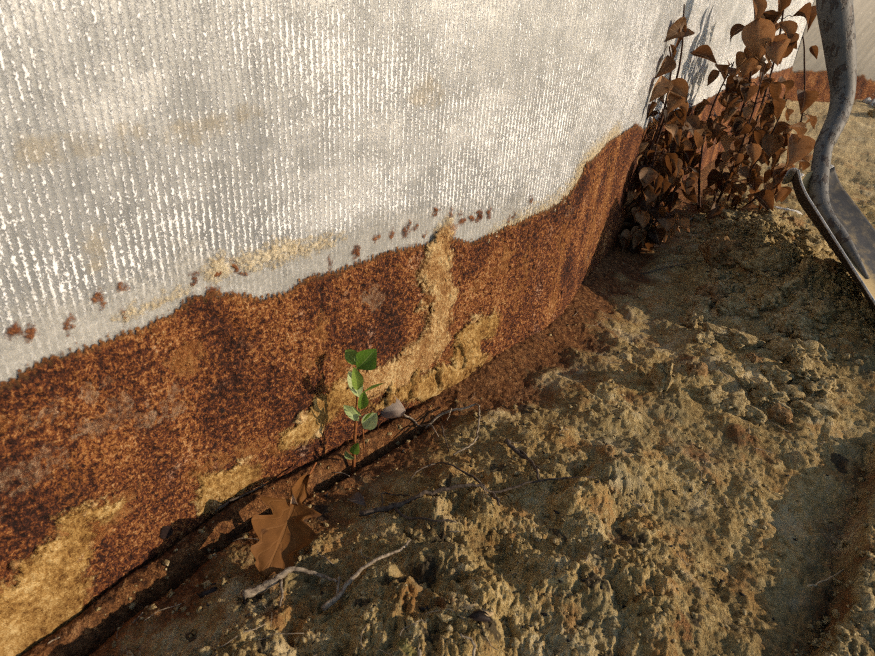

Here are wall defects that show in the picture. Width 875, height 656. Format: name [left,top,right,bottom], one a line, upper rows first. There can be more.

rust [0,219,435,610]
damp [0,191,526,386]
rust [419,119,666,380]
rust [669,66,830,192]